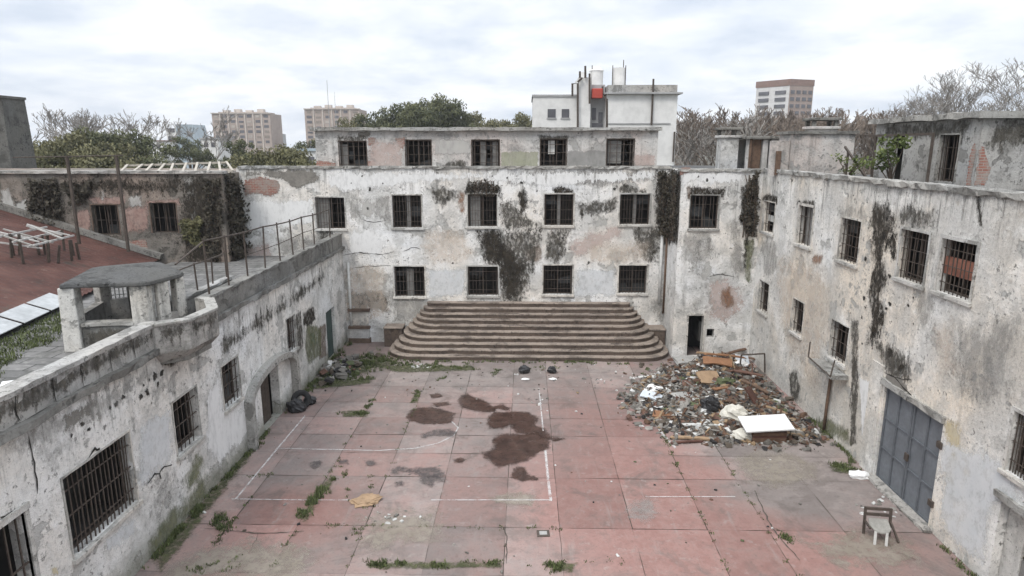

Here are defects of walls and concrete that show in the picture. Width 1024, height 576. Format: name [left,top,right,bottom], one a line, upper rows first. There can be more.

spalling [243,161,336,197]
leakage [430,181,571,301]
leakage [578,169,726,263]
leakage [739,172,777,268]
flaking render [966,143,991,186]
leakage [850,201,935,446]
crack [15,396,38,494]